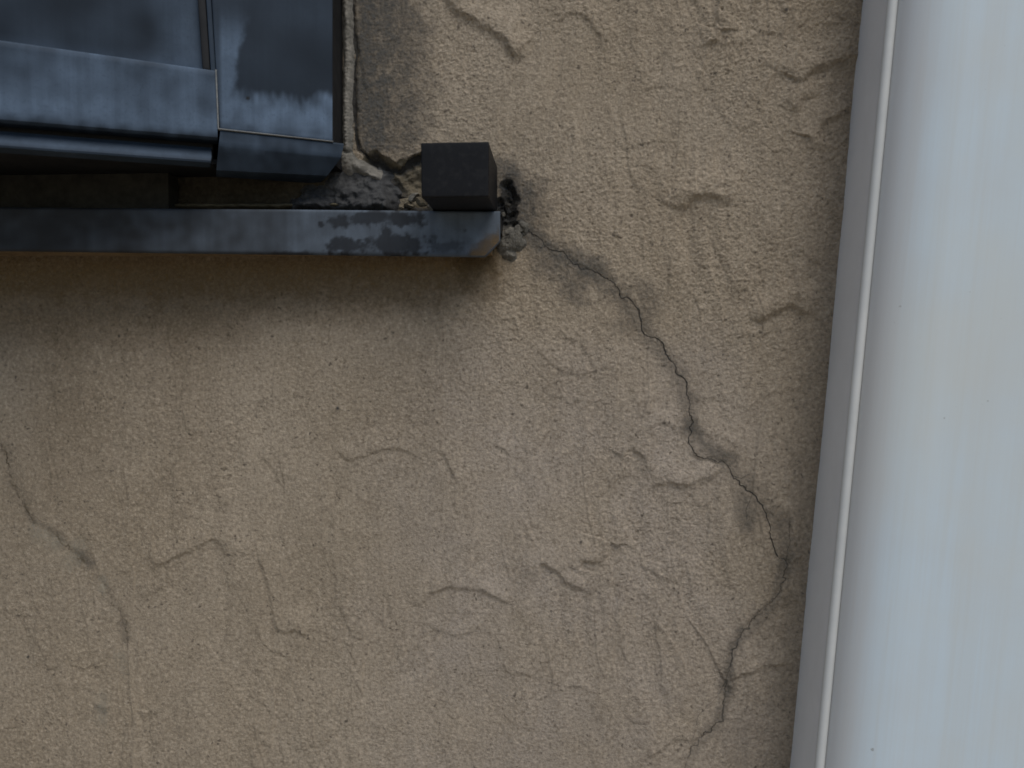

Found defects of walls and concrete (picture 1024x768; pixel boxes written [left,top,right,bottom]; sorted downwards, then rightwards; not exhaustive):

spalling [363,150,434,211]
spalling [497,179,529,262]
crack [512,226,788,583]